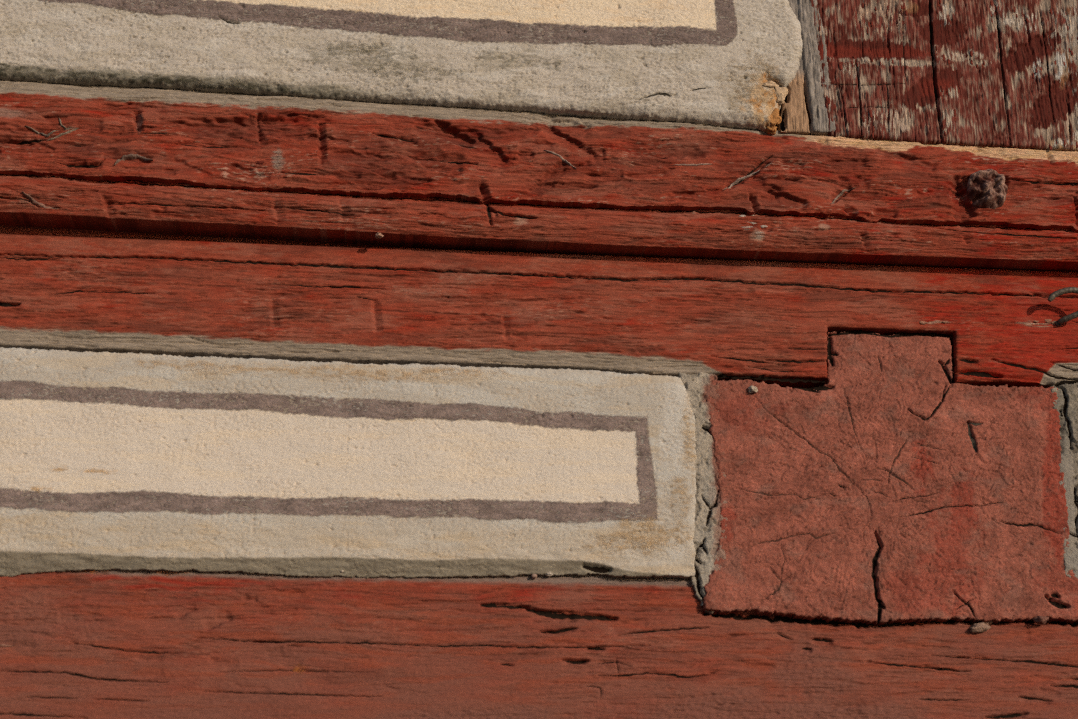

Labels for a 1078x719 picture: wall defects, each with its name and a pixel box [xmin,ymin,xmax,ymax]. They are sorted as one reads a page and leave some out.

peeling [854,0,908,40]
peeling [839,46,987,78]
peeling [937,0,954,26]
peeling [990,0,1078,86]
spalling [748,72,788,135]
peeling [824,79,836,111]
peeling [818,85,960,147]
peeling [966,106,1078,161]
crack [828,331,947,372]
crack [694,386,1078,624]